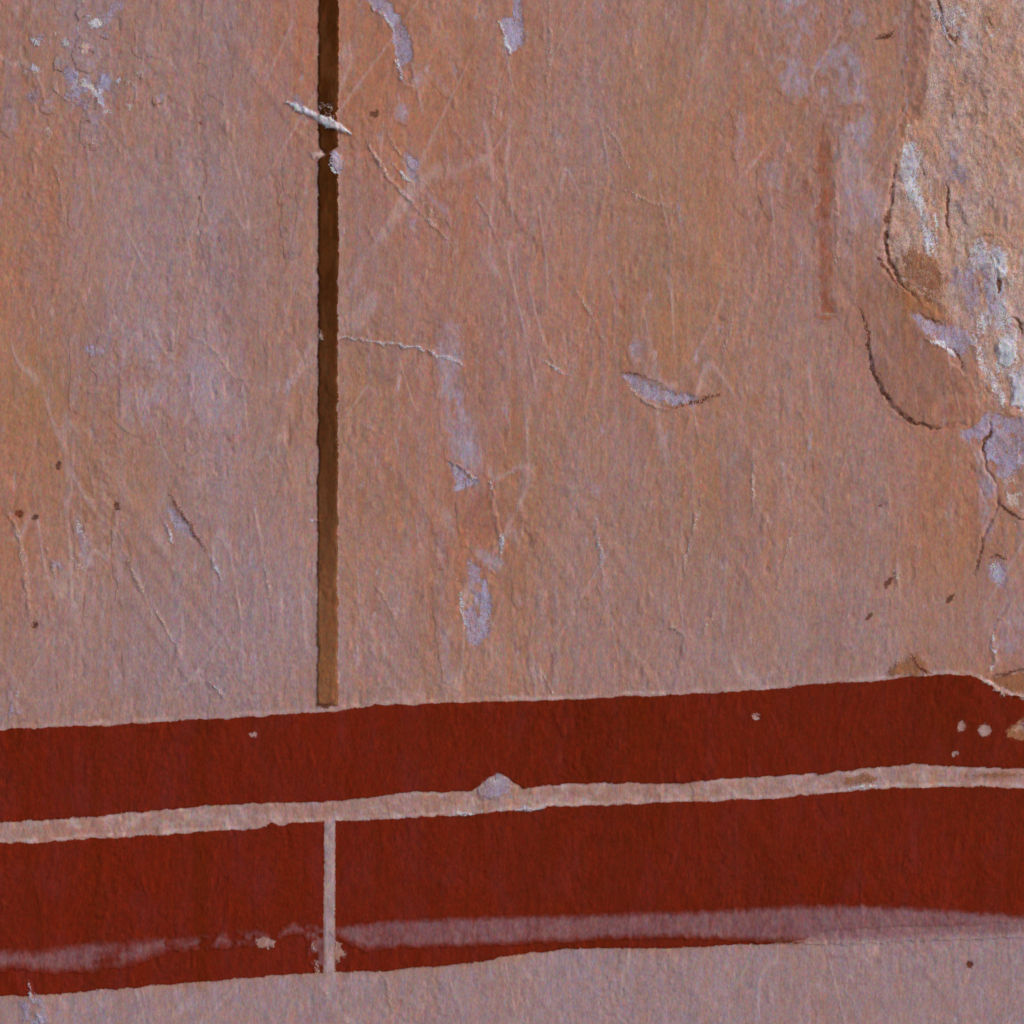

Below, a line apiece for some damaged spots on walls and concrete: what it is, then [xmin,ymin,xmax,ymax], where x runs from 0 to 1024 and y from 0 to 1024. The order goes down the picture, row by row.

peeling [22,0,156,150]
peeling [365,0,453,126]
crack [877,257,905,294]
spalling [876,0,1024,546]
spalling [619,335,720,410]
crack [859,308,941,431]
crack [946,347,964,372]
crack [981,417,993,466]
crack [998,502,1024,527]
crack [973,537,1007,576]